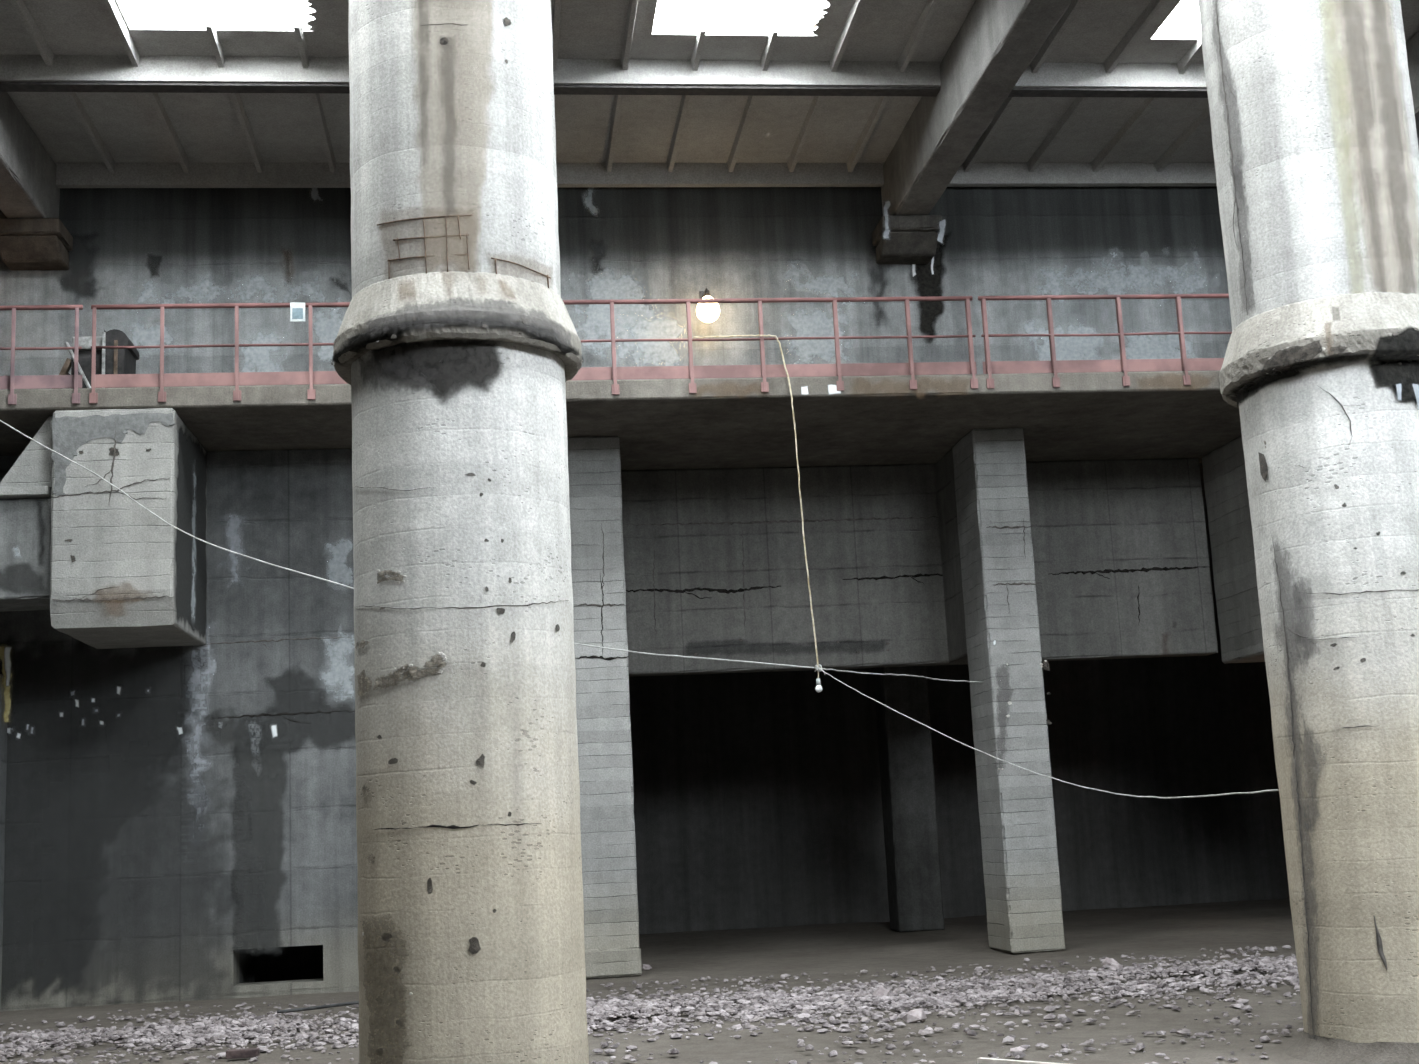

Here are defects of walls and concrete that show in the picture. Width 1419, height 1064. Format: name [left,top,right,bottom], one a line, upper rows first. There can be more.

leakage [872,201,890,325]
leakage [910,220,949,343]
crack [1317,385,1361,447]
spalling [1370,327,1419,409]
leakage [0,427,355,1005]
spalling [357,652,447,697]